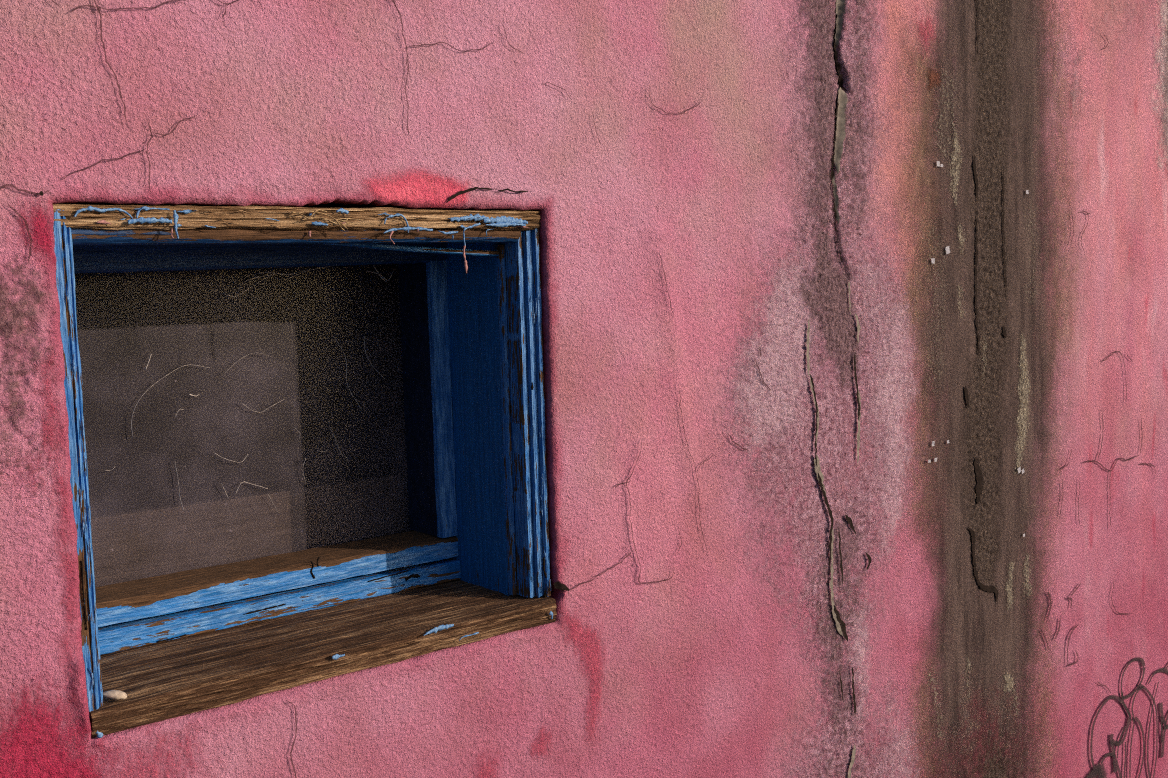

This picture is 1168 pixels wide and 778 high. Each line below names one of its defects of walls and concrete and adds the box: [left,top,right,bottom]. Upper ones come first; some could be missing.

crack [0,0,197,263]
crack [392,0,524,139]
crack [446,187,529,203]
crack [831,0,861,463]
crack [1070,207,1091,253]
damp [0,267,54,424]
damp [905,0,1061,778]
crack [806,319,872,714]
crack [848,745,856,778]